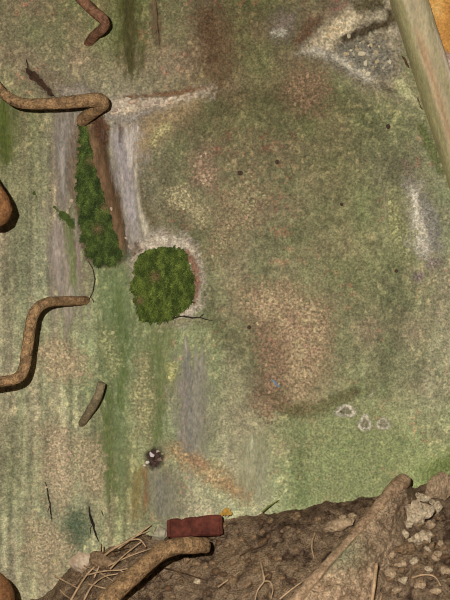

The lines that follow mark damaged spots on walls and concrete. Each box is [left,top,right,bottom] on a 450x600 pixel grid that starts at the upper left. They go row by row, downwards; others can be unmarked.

leakage [111,99,206,328]
leakage [402,162,444,270]